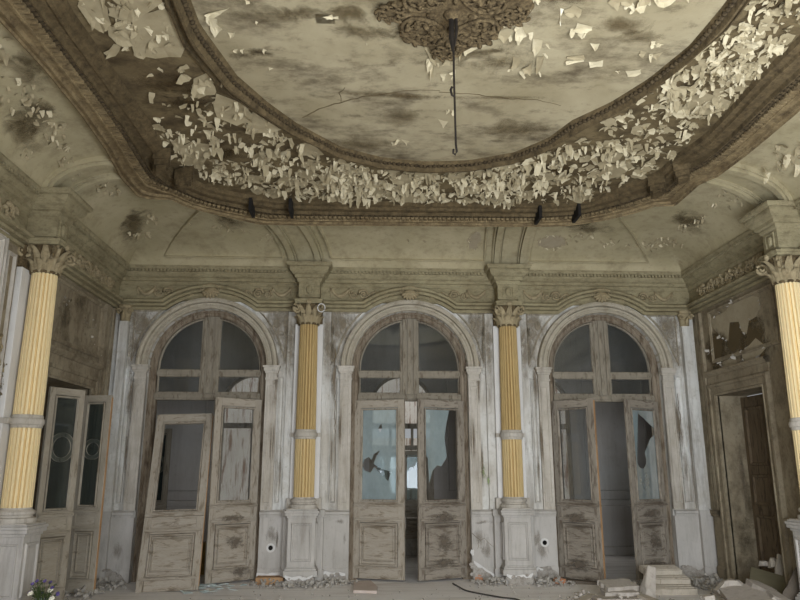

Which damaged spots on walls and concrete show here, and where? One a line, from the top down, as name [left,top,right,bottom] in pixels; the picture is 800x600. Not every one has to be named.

damp [611,21,632,29]
peeling [0,76,70,153]
crack [302,89,561,118]
peeling [77,0,800,209]
flaking render [711,295,765,367]